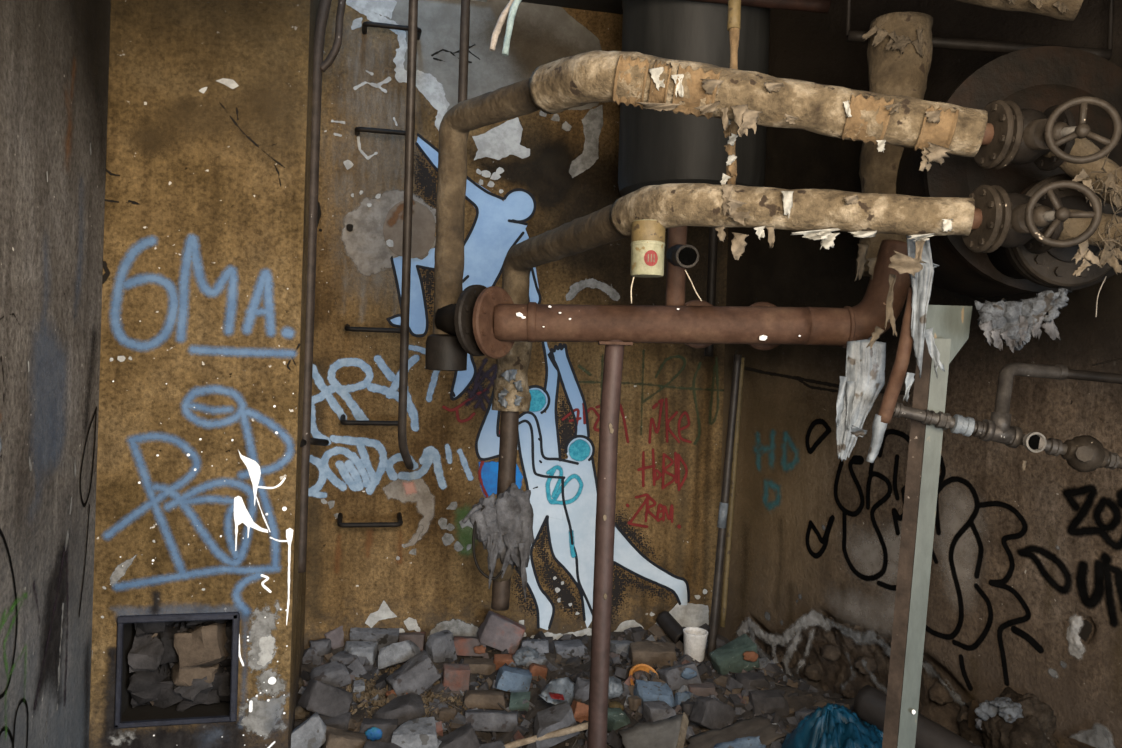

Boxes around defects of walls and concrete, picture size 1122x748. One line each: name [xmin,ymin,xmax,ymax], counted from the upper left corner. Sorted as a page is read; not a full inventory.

peeling [346,0,602,131]